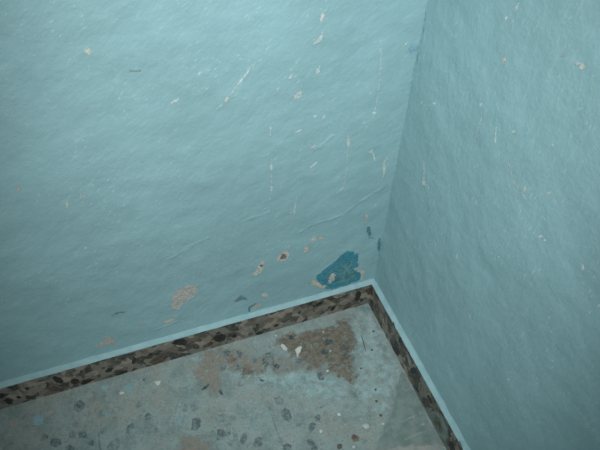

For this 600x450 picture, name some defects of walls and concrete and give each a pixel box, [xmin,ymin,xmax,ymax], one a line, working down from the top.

peeling [305,250,366,290]